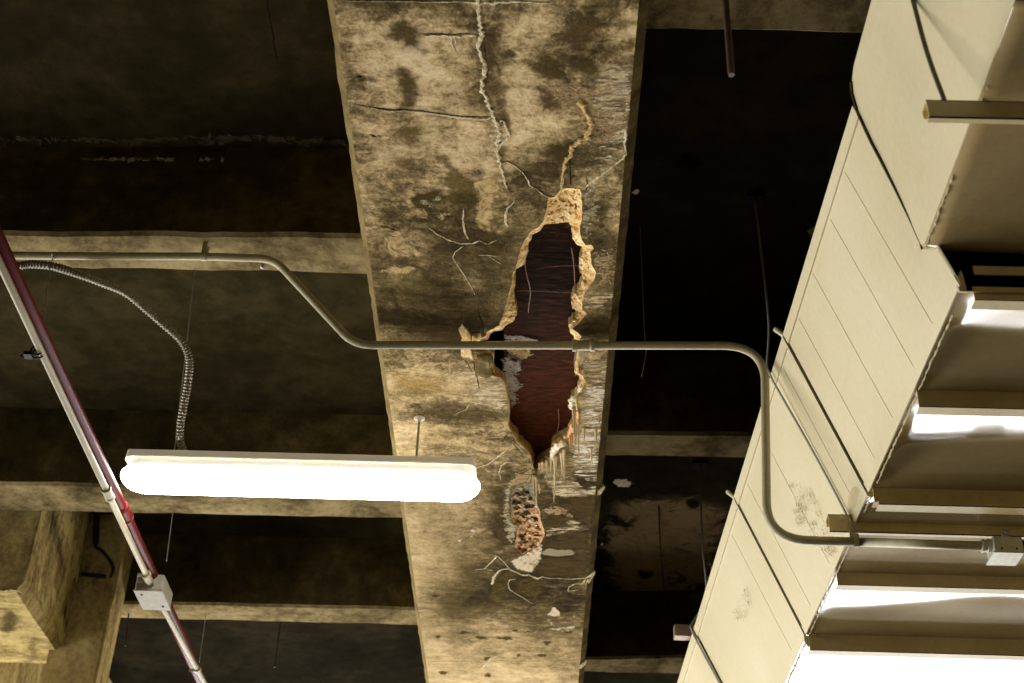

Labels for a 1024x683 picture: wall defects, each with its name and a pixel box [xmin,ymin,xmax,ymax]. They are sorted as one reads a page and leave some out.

damp [387,21,426,51]
damp [397,68,419,108]
damp [469,10,516,127]
damp [532,1,634,239]
damp [412,156,478,211]
peeling [474,175,500,231]
crack [352,0,632,335]
damp [507,147,572,186]
spalling [459,188,613,470]
damp [490,351,729,599]
spalling [510,483,545,556]
crack [476,554,593,608]